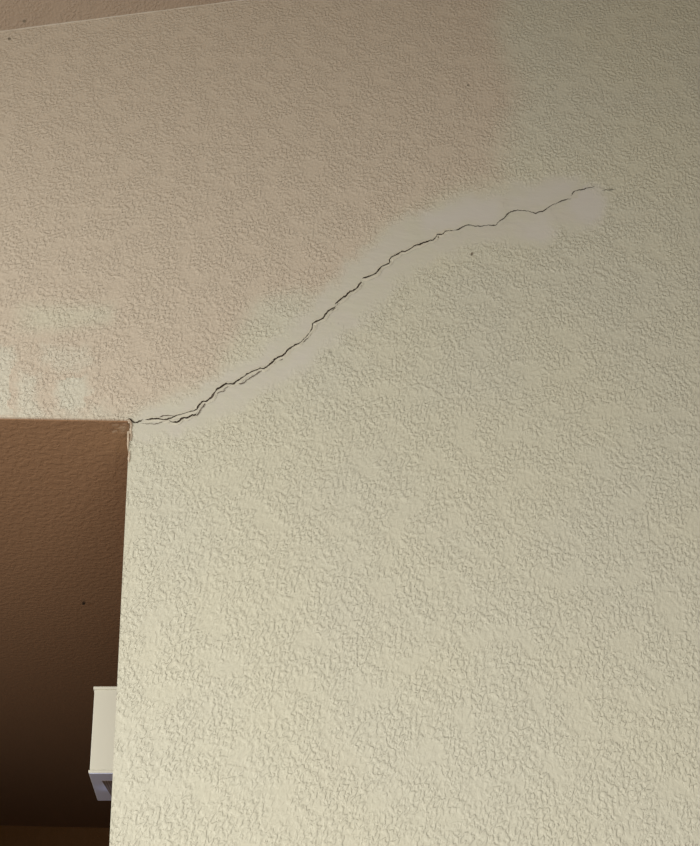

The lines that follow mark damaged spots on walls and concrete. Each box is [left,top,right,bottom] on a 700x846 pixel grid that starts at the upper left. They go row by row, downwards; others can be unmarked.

crack [129,186,613,425]